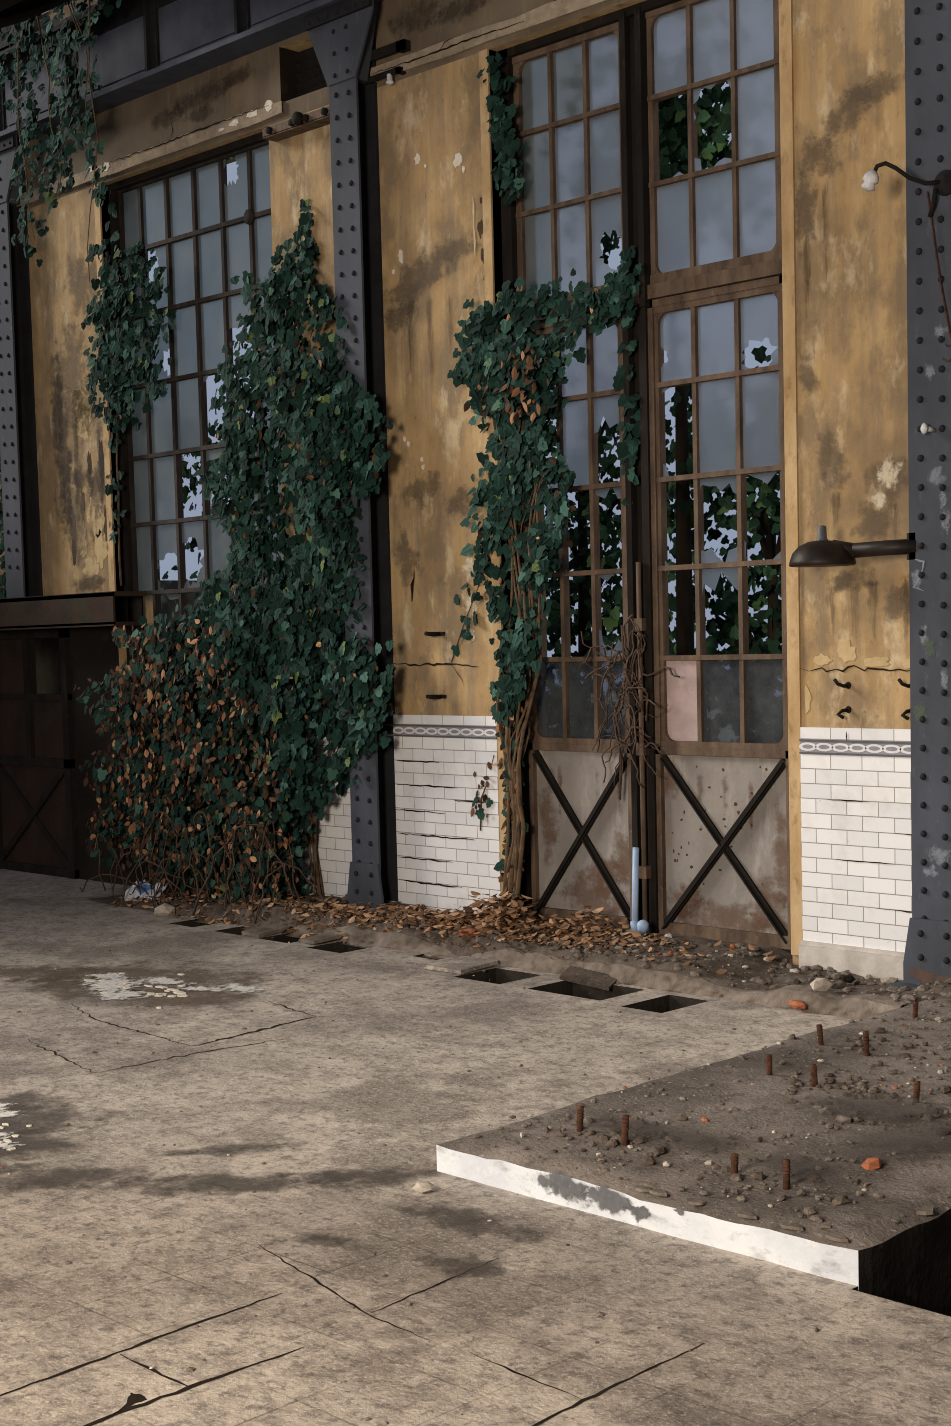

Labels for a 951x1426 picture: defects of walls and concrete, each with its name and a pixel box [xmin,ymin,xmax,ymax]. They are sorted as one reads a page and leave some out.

water stain [806,75,894,172]
water stain [386,241,477,332]
water stain [52,325,105,562]
water stain [0,961,263,1007]
crack [0,1246,498,1426]
crack [470,1343,704,1426]